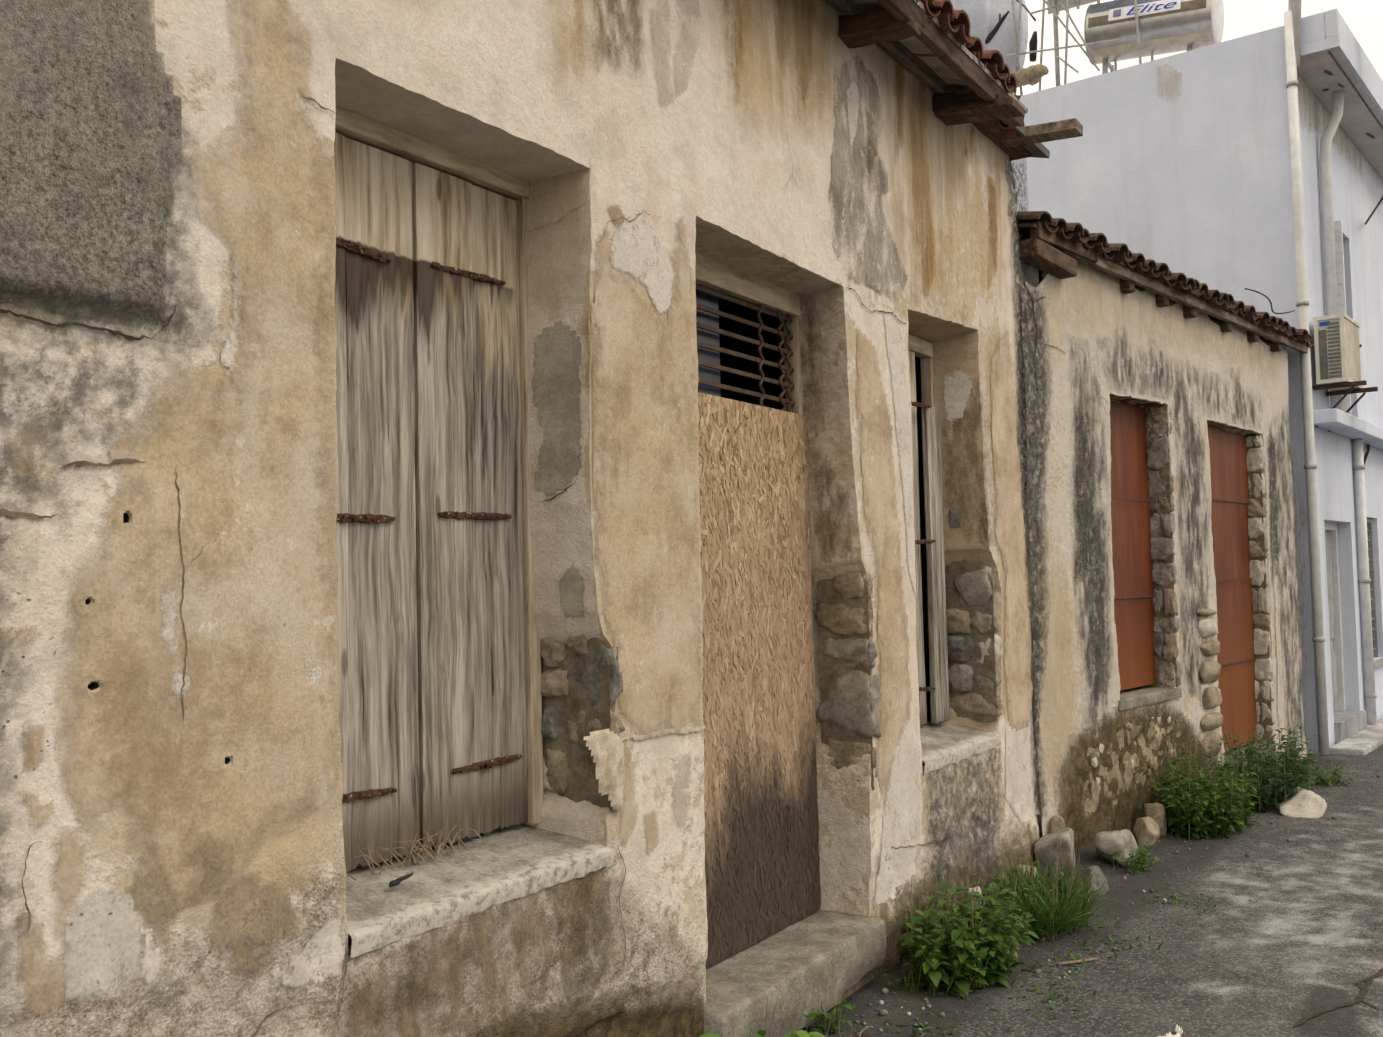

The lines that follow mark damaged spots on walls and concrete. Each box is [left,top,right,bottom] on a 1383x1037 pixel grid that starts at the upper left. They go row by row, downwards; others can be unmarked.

crack [0,304,177,341]
crack [61,458,208,723]
peeling [23,0,340,977]
peeling [532,205,703,854]
peeling [815,329,912,807]
flaking render [829,55,908,298]
peeling [945,332,1034,731]
damp [1006,160,1255,816]
peeling [19,914,68,1015]
crack [251,1004,287,1037]